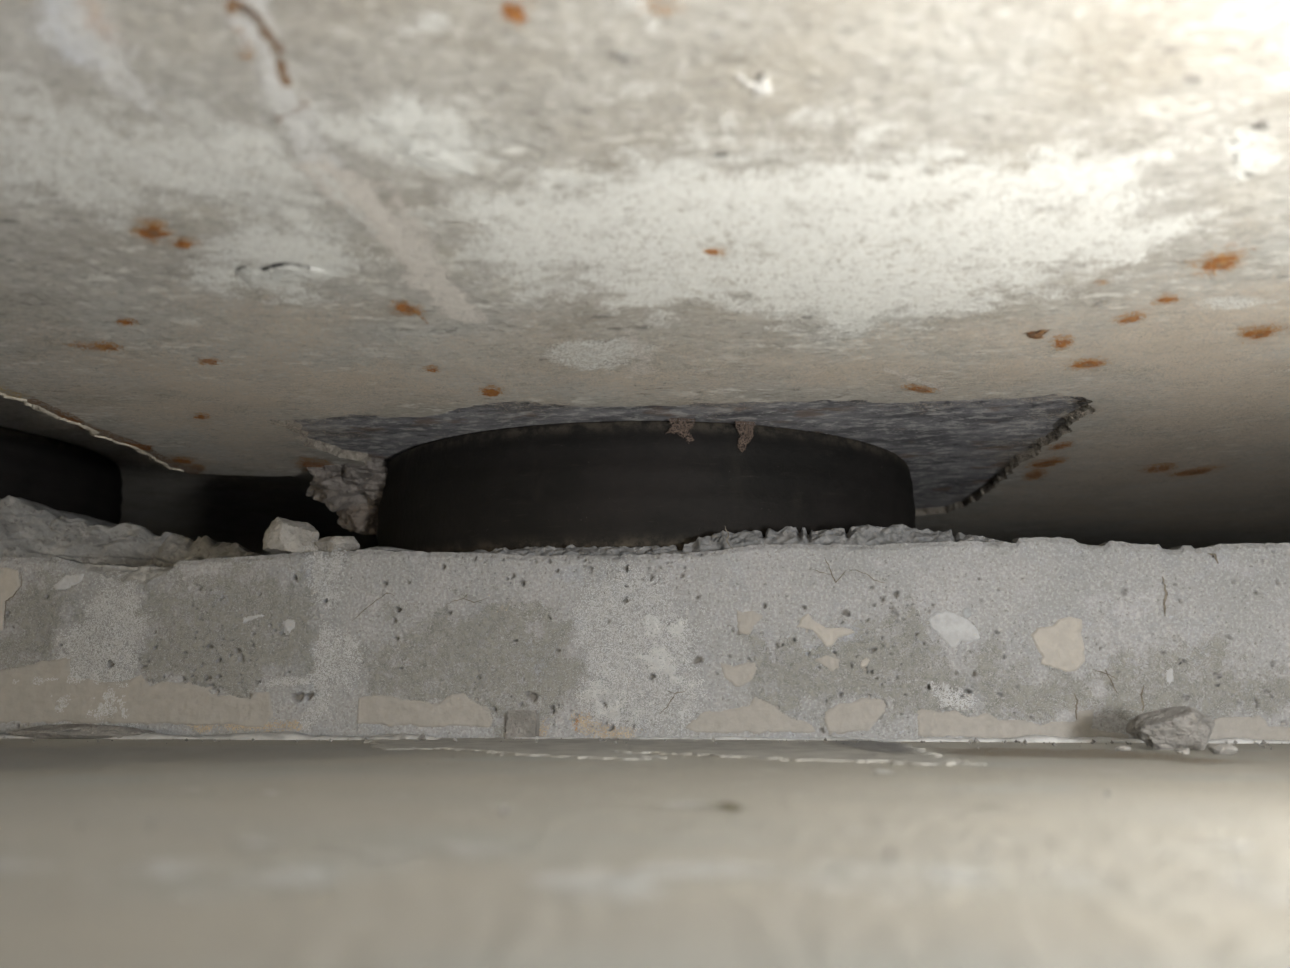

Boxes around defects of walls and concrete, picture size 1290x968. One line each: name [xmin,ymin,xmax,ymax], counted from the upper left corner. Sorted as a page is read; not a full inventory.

corrosion [490,0,537,28]
corrosion [220,0,292,86]
corrosion [129,216,203,249]
corrosion [1184,242,1259,278]
corrosion [1110,292,1182,326]
corrosion [1233,321,1290,344]
corrosion [1024,329,1114,371]